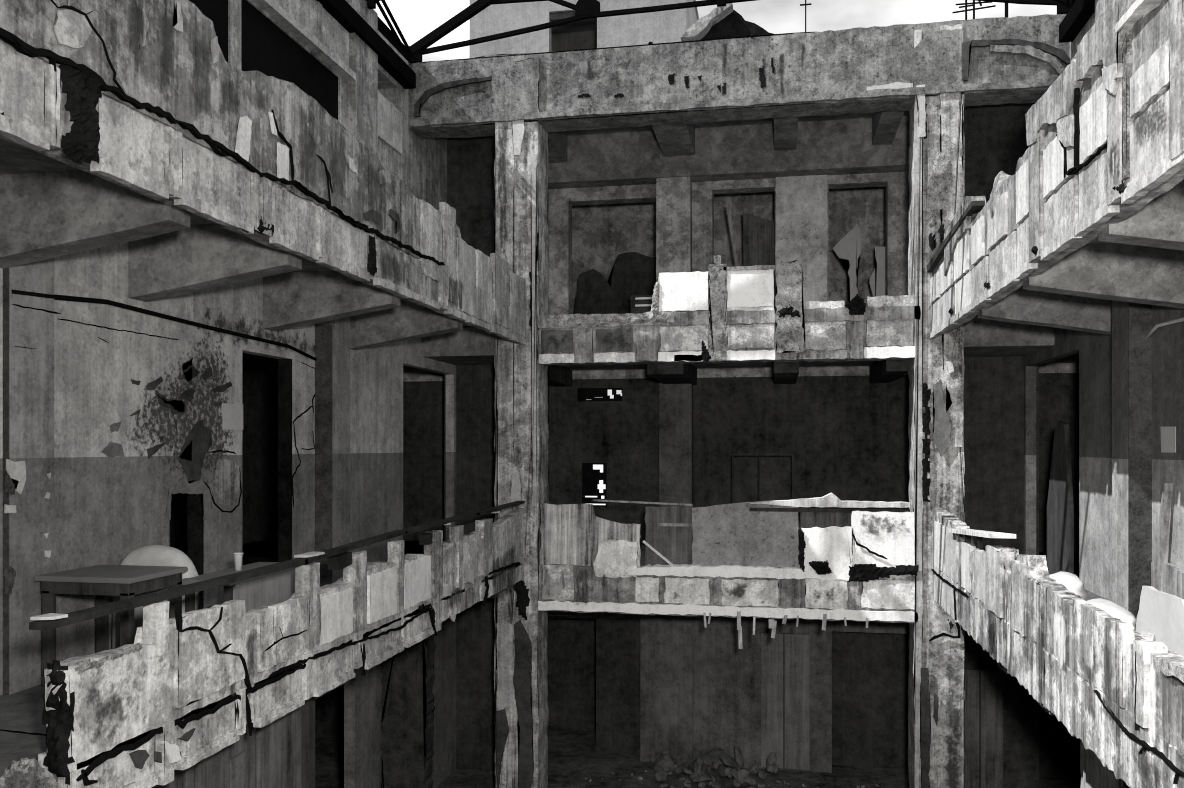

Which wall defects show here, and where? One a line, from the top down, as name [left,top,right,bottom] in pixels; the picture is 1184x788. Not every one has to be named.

spalling [59,63,103,165]
crack [0,0,445,265]
crack [12,304,178,343]
peeling [101,357,240,520]
peeling [217,523,238,563]
spalling [0,643,142,788]
crack [76,603,437,786]
crack [1093,651,1184,784]